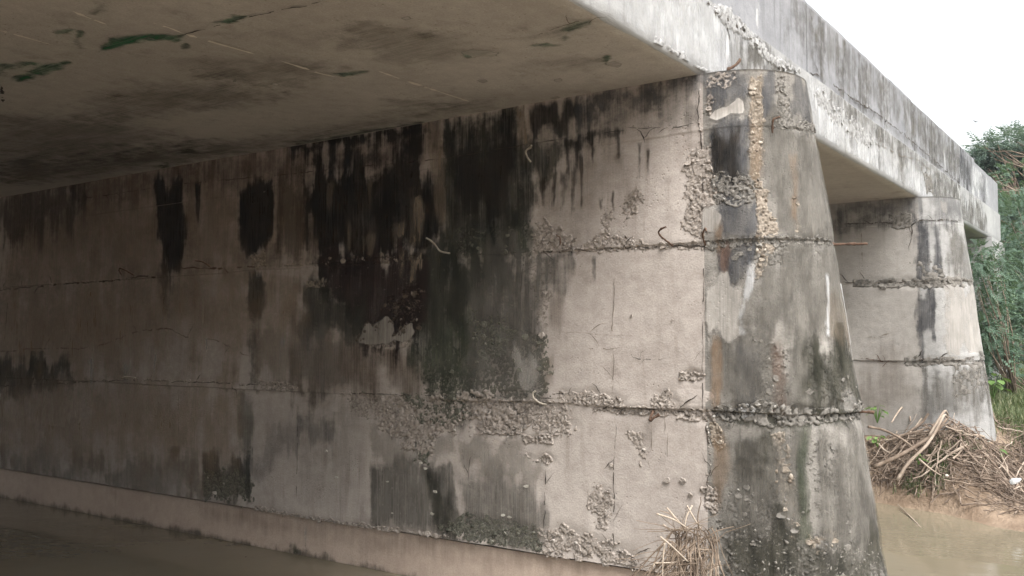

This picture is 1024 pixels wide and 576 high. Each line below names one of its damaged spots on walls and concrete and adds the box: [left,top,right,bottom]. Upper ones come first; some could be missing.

leakage [145,167,201,314]
leakage [239,0,990,576]
spalling [374,3,887,576]
leakage [0,351,74,398]
leakage [202,449,253,503]
spalling [203,466,638,572]